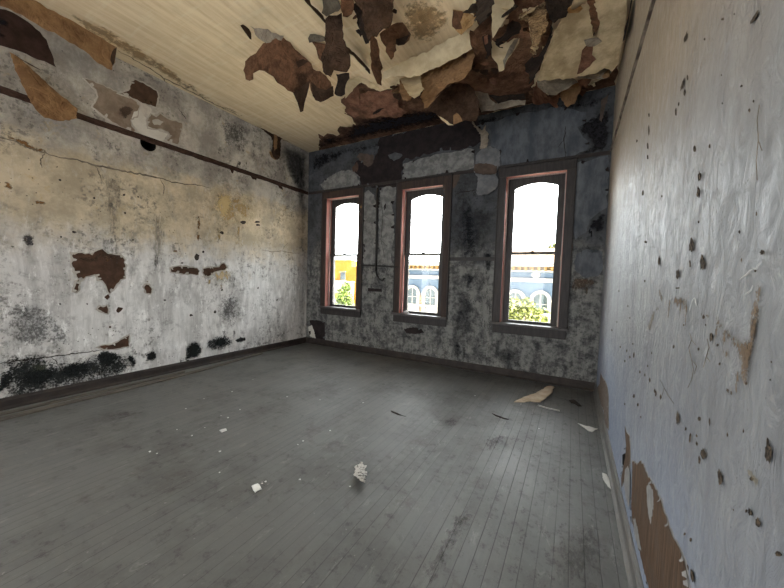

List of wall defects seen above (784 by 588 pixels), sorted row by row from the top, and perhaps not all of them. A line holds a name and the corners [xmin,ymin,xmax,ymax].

peeling [0,0,117,121]
crack [0,137,208,194]
peeling [82,77,184,146]
peeling [243,0,620,265]
peeling [69,248,127,315]
peeling [169,251,228,277]
water stain [0,351,136,398]
peeling [676,411,706,464]
peeling [620,426,694,588]